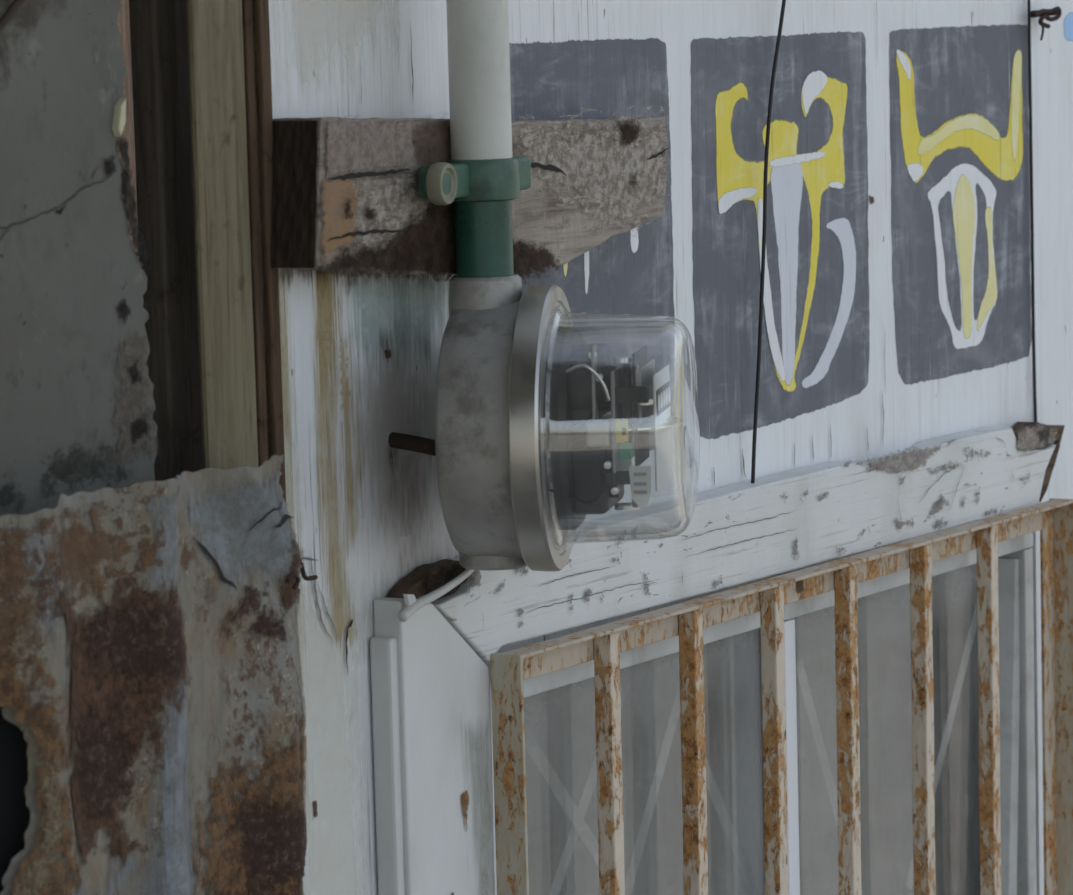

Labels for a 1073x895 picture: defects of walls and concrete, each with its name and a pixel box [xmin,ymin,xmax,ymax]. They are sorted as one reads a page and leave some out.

crack [0,164,117,241]
spalling [104,98,149,272]
spalling [118,299,131,321]
spalling [112,332,159,470]
peeling [844,446,959,484]
peeling [1017,423,1057,451]
peeling [929,495,949,529]
corrosion [224,538,302,653]
corrosion [0,500,191,895]
corrosion [191,697,307,895]
corrosion [461,791,469,831]